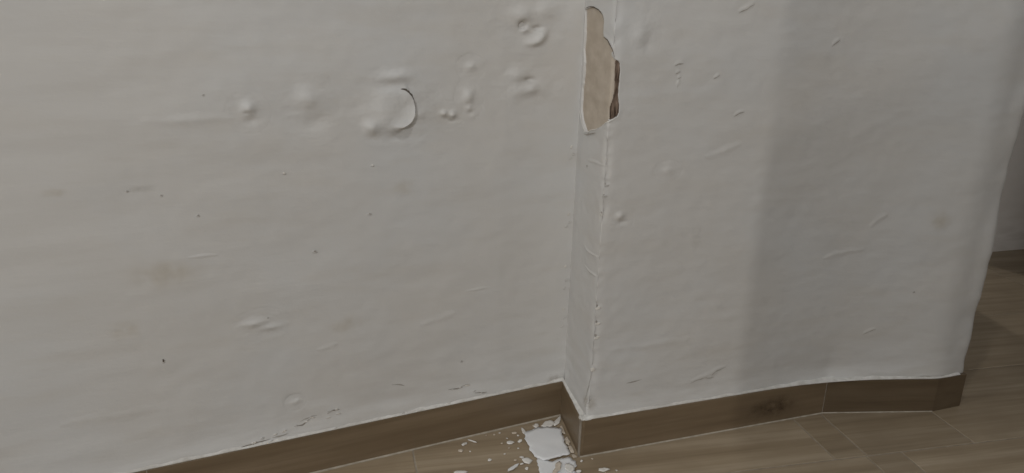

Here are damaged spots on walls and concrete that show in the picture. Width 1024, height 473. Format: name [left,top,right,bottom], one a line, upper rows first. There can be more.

peeling [579,2,625,136]